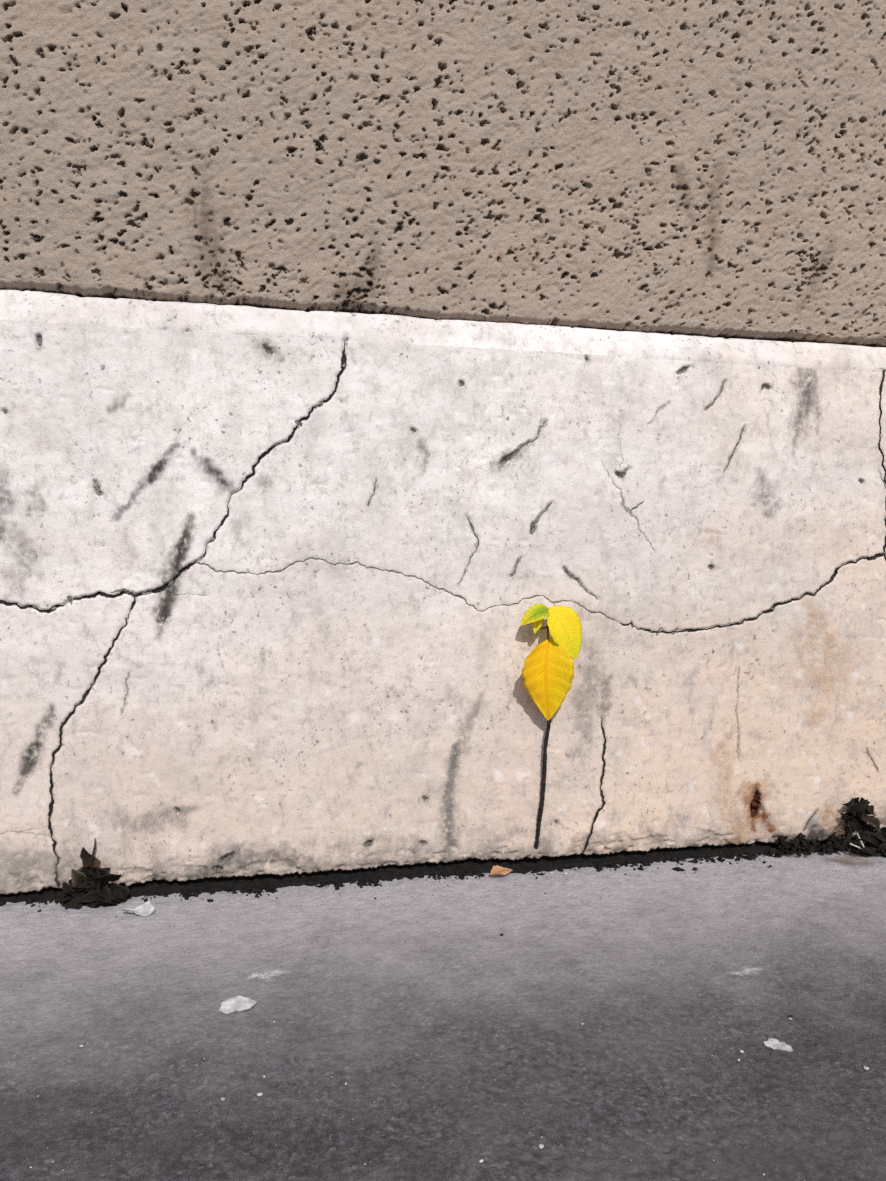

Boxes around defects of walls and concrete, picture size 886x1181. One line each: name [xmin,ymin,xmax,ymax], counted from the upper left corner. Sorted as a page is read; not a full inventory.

crack [0,337,886,889]
corrosion [725,770,778,844]